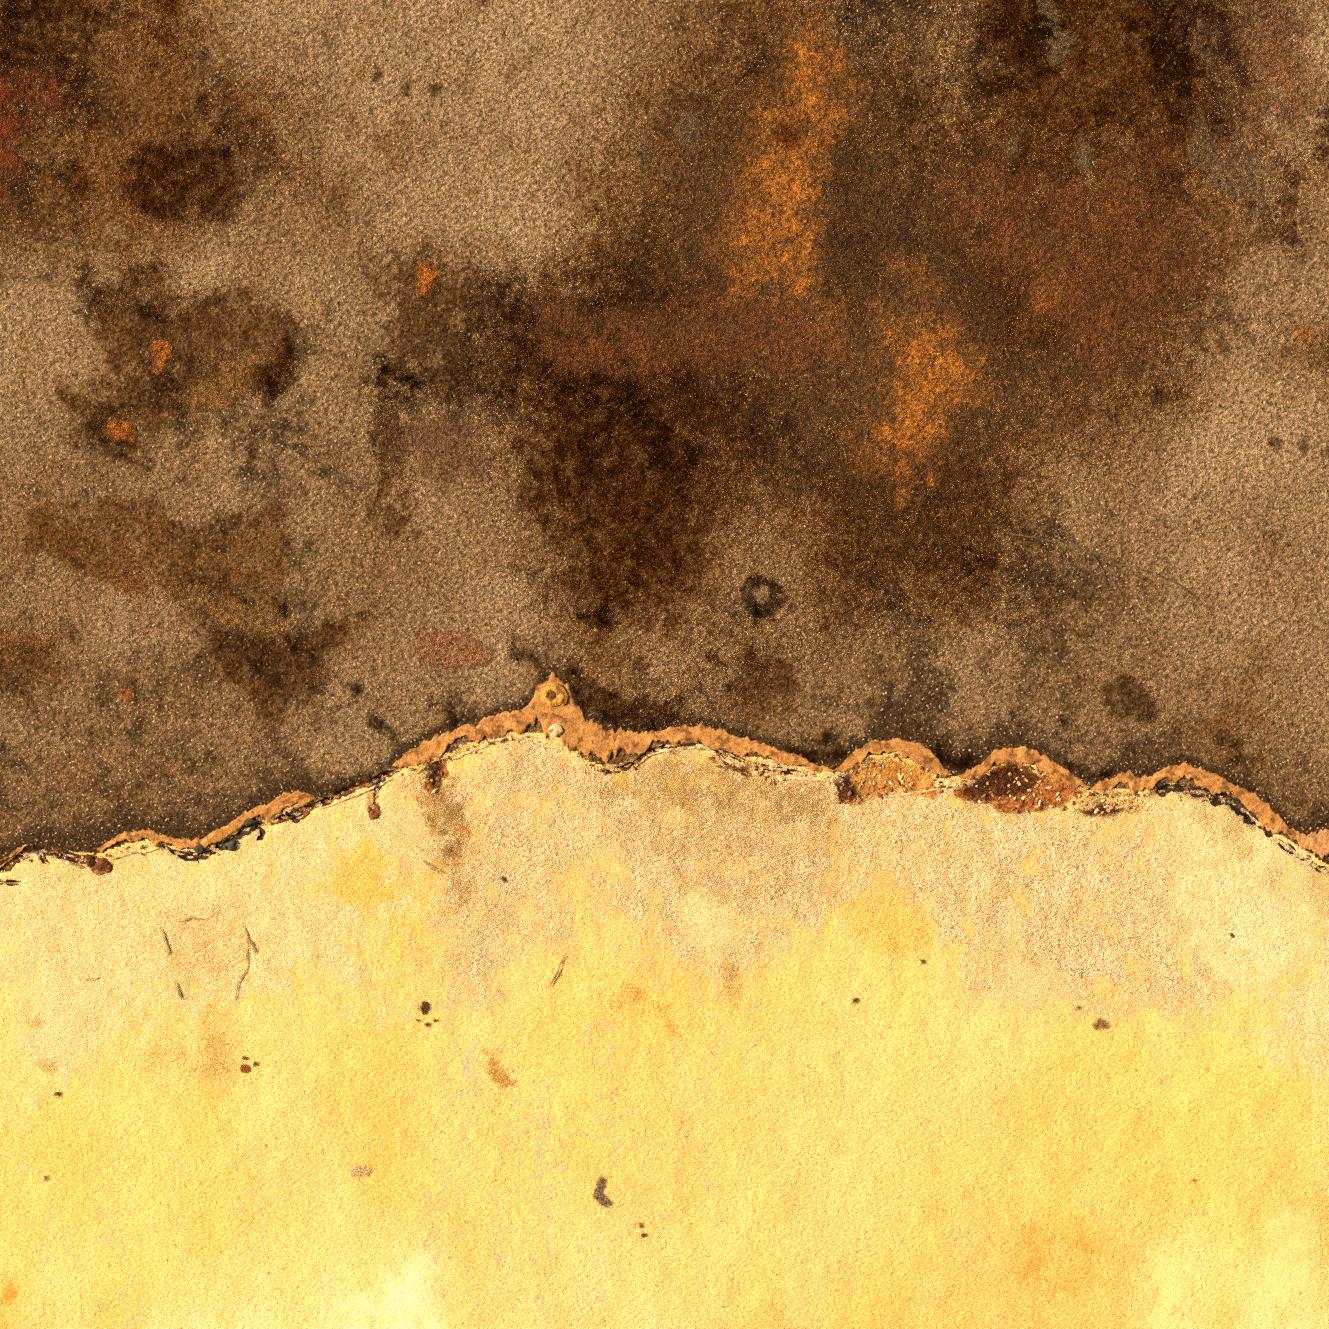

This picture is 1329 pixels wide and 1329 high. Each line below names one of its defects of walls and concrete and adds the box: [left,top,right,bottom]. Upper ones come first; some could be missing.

damp [131,143,240,220]
corrosion [537,23,855,377]
damp [61,382,139,445]
damp [97,266,288,408]
damp [418,265,436,294]
damp [540,334,725,628]
corrosion [867,312,986,492]
peeling [0,672,1329,1097]
peeling [593,1176,611,1208]